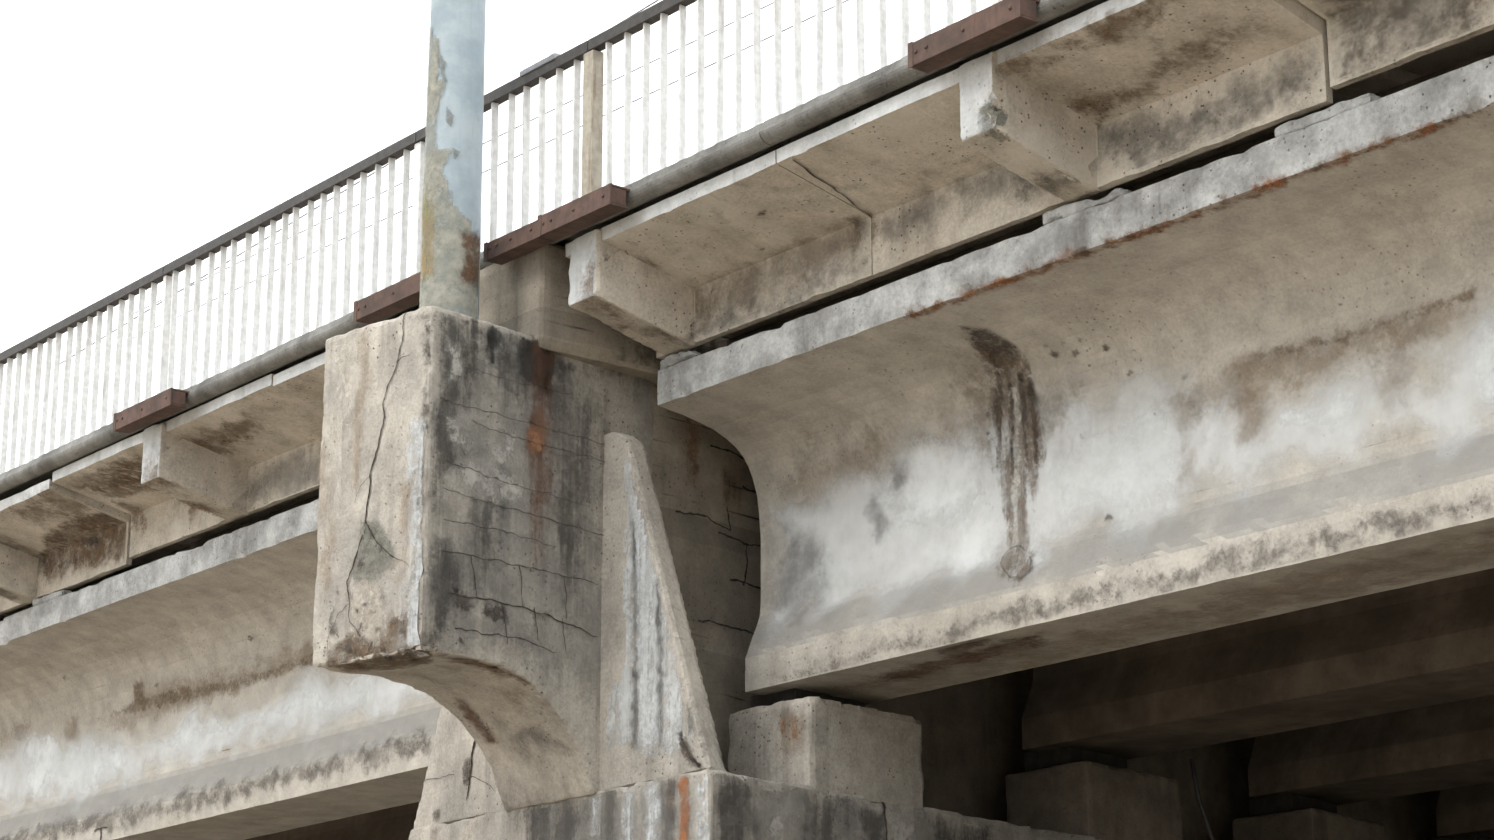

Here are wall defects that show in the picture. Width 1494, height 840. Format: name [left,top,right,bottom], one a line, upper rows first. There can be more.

peeling [419,28,480,352]
rust [906,301,943,318]
rust [961,176,1284,301]
rust [1309,114,1469,173]
crack [327,312,409,649]
water stain [401,318,523,657]
crack [443,460,604,653]
water stain [606,460,694,755]
water stain [775,322,1494,620]
water stain [0,659,429,800]
crack [423,740,493,818]
rust [678,776,689,840]